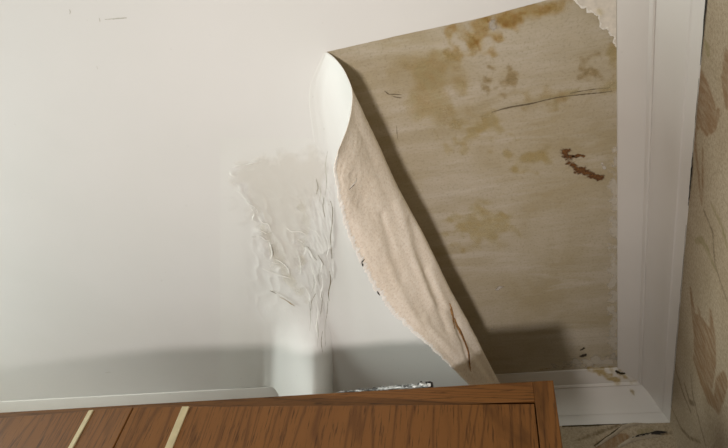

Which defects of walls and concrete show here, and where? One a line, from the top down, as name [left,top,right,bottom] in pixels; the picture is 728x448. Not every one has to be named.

crack [494,87,611,112]
corrosion [562,149,604,181]